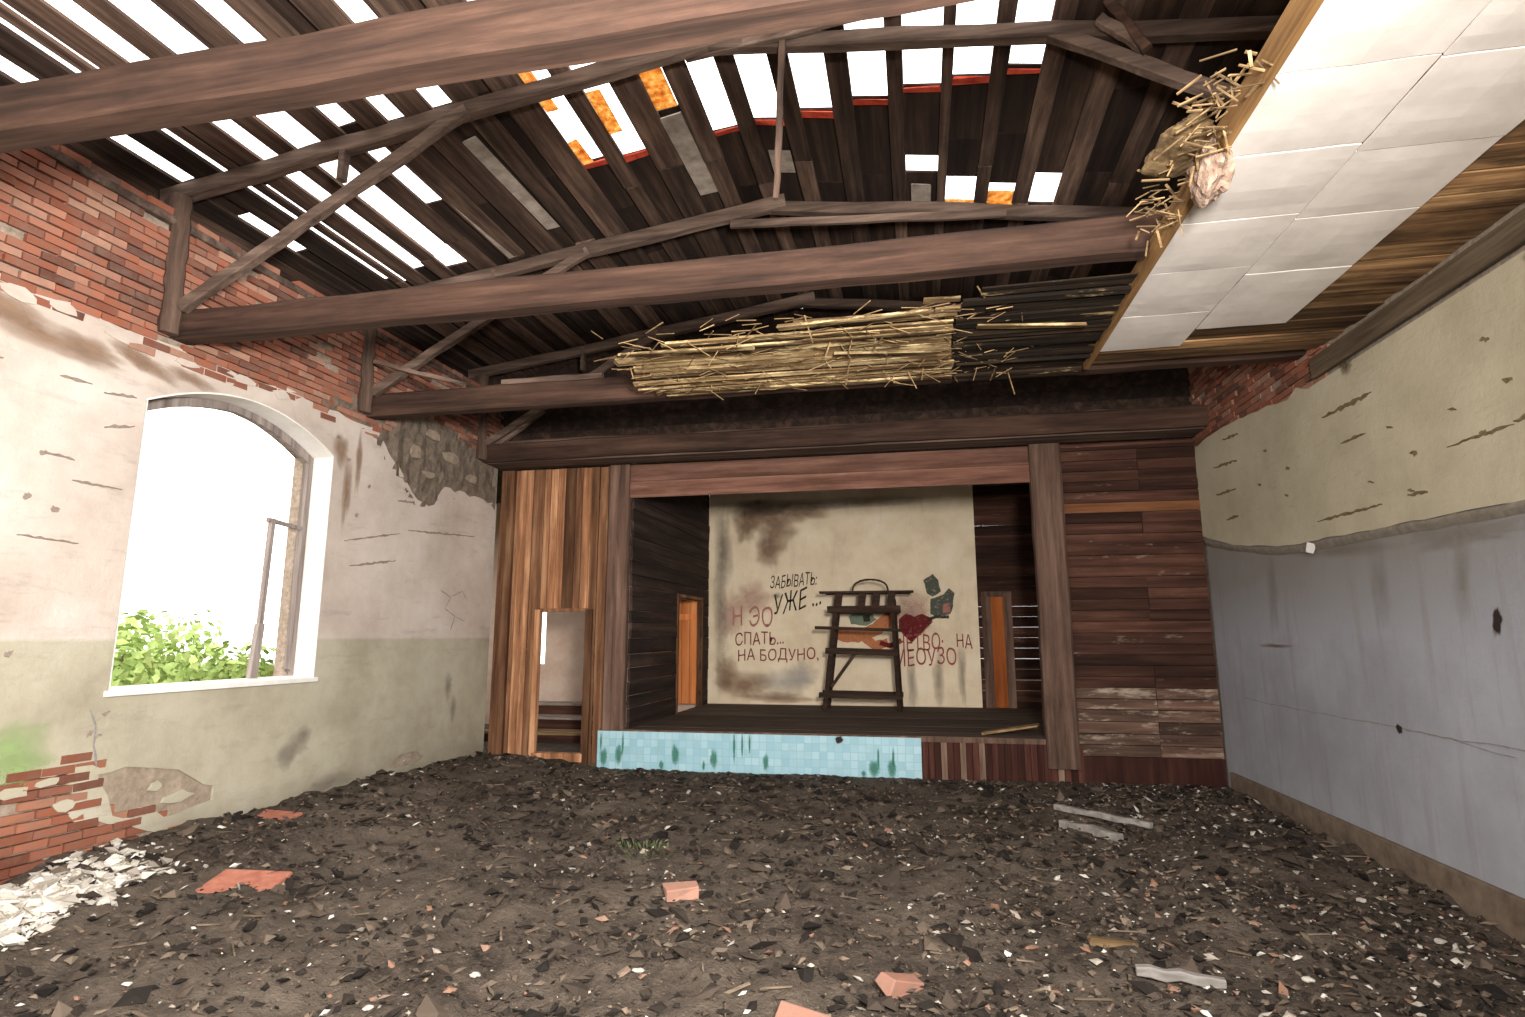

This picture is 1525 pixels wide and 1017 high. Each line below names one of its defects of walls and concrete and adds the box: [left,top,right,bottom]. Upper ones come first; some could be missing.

flaking render [0,145,504,510]
leakage [741,508,814,559]
flaking render [0,710,212,885]